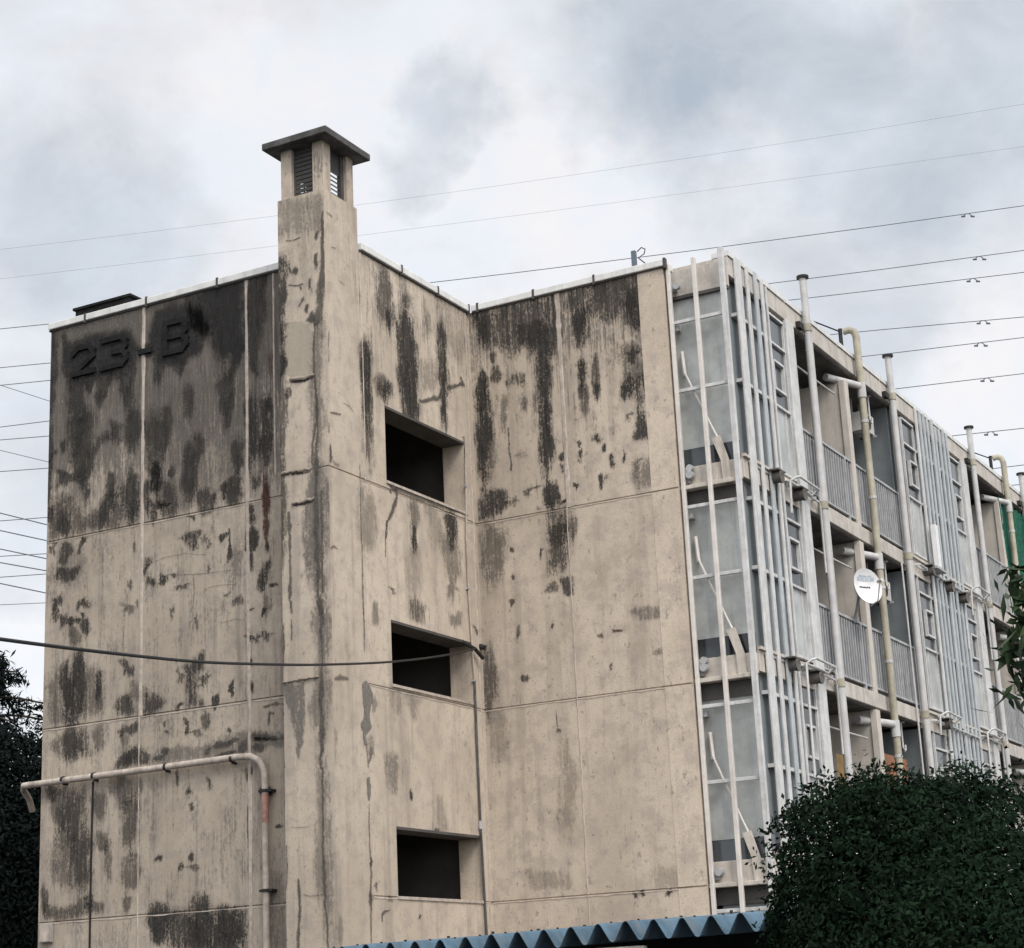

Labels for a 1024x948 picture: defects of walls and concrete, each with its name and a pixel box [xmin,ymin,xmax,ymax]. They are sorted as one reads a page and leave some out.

leakage [47,256,309,592]
leakage [359,265,420,464]
leakage [437,323,451,434]
leakage [472,275,640,596]
leakage [621,347,648,440]
rust [261,474,270,548]
leakage [53,651,102,760]
leakage [115,650,210,768]
leakage [122,795,140,849]
leakage [41,886,103,921]
leakage [146,892,249,948]